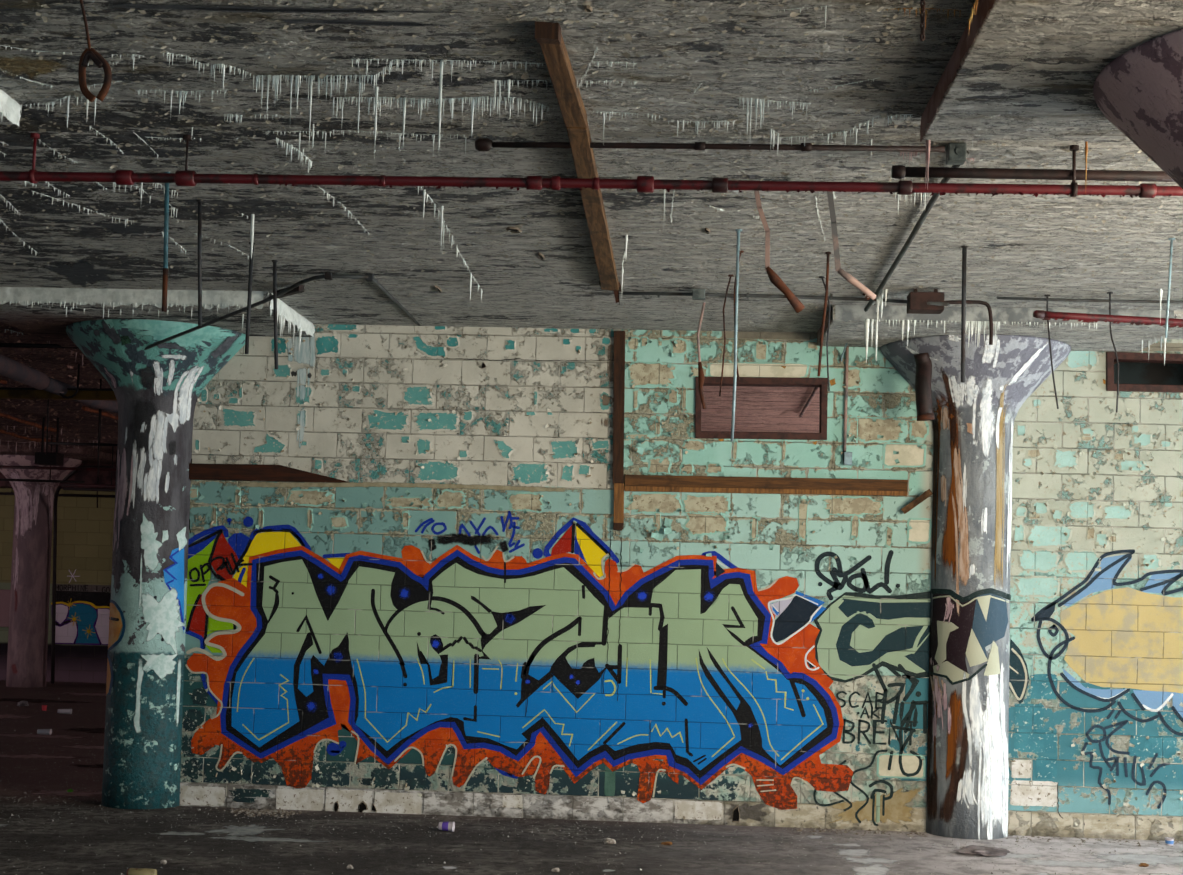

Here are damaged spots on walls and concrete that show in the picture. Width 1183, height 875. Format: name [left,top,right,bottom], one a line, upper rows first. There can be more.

leakage [0,45,124,154]
leakage [136,52,553,173]
peeling [362,384,611,529]
peeling [276,489,349,531]
peeling [624,492,732,557]
peeling [798,496,932,555]
peeling [1012,496,1134,599]
peeling [1140,536,1166,571]
peeling [133,661,144,733]
peeling [876,753,926,779]
peeling [1010,674,1058,807]
peeling [1100,718,1181,768]